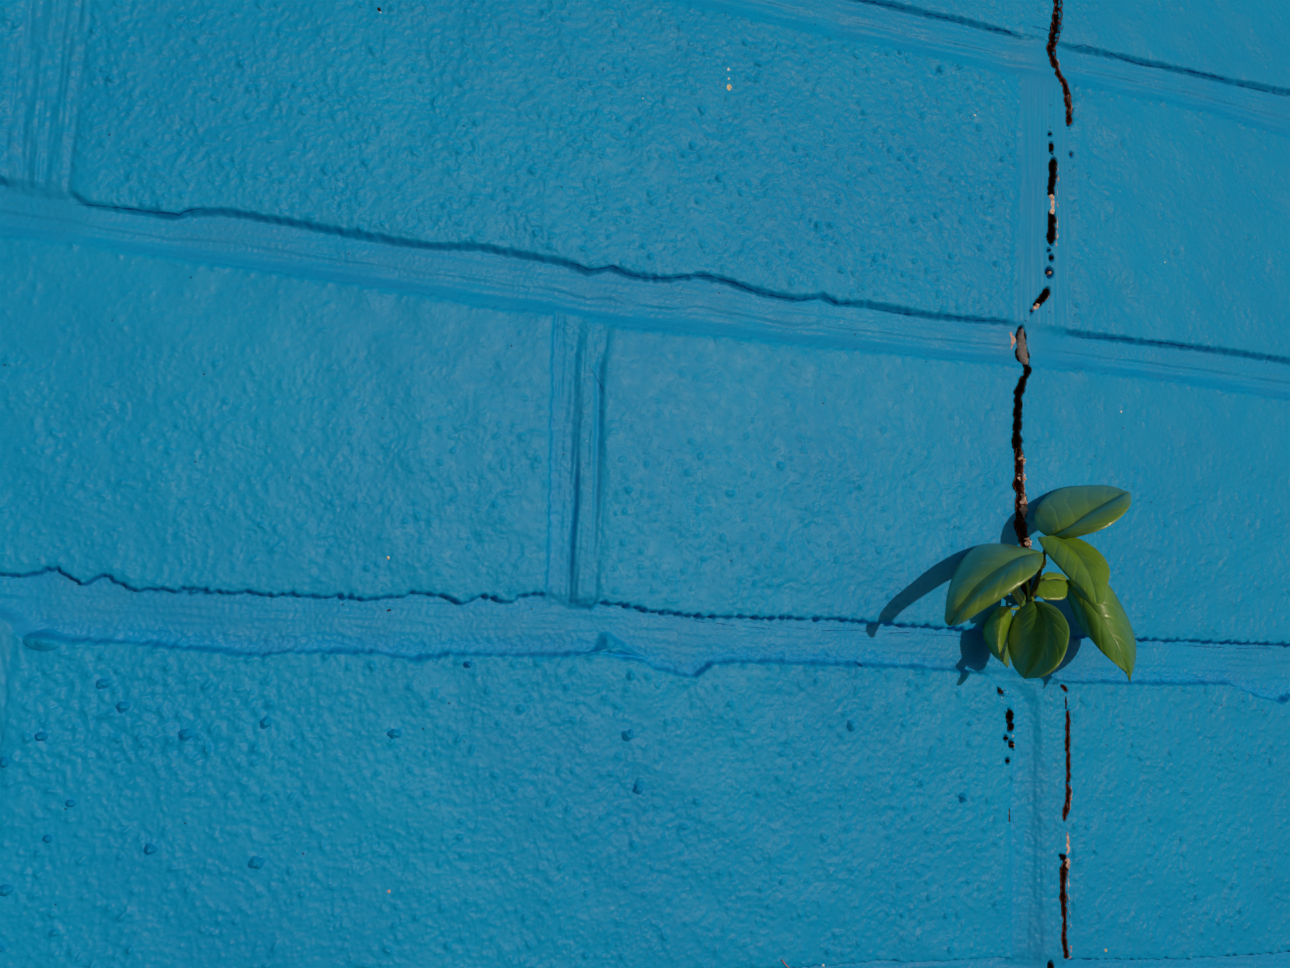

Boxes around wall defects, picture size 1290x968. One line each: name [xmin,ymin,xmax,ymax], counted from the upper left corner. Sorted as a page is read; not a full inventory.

crack [571,0,1285,597]
crack [997,688,1015,763]
crack [1047,683,1073,968]